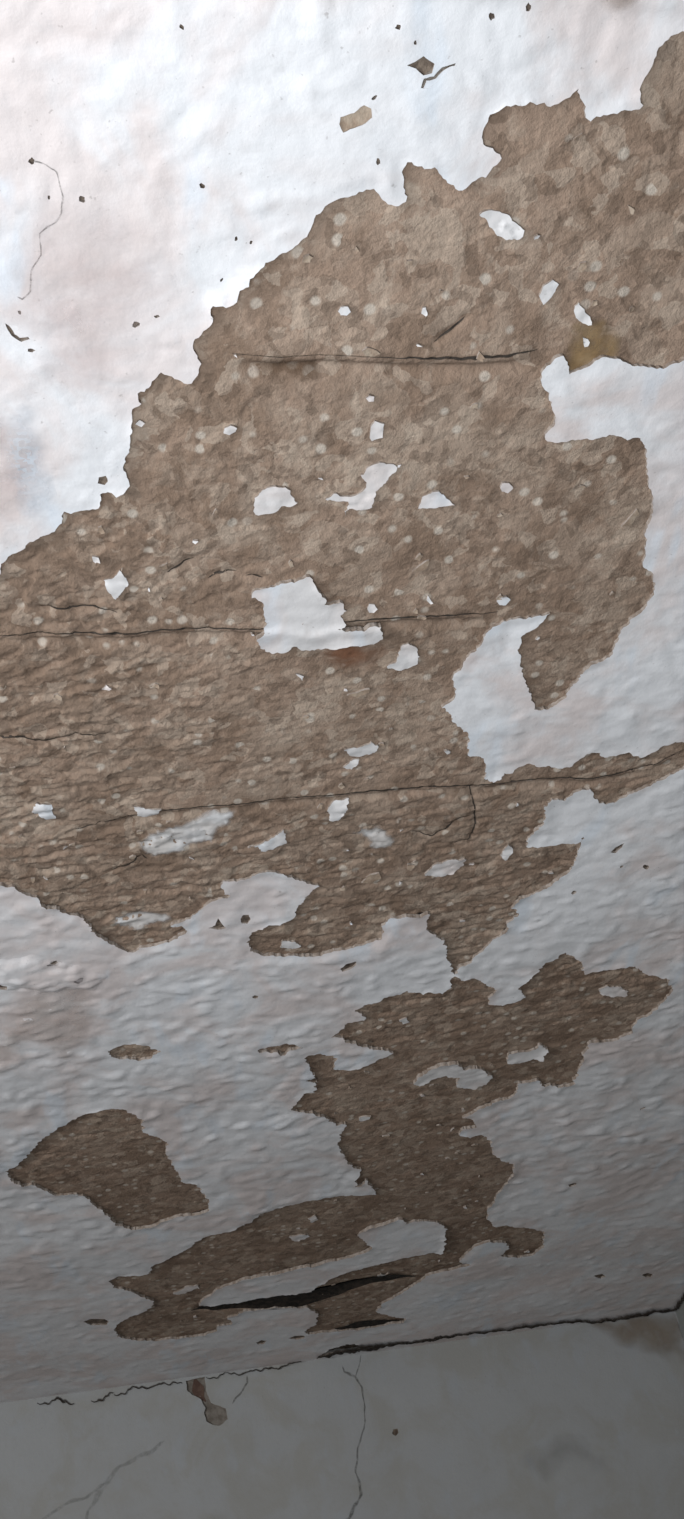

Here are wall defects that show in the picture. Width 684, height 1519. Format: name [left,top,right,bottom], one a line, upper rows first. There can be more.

peeling [0,31,684,971]
peeling [8,1109,209,1227]
peeling [110,953,672,1339]
crack [37,1275,684,1519]